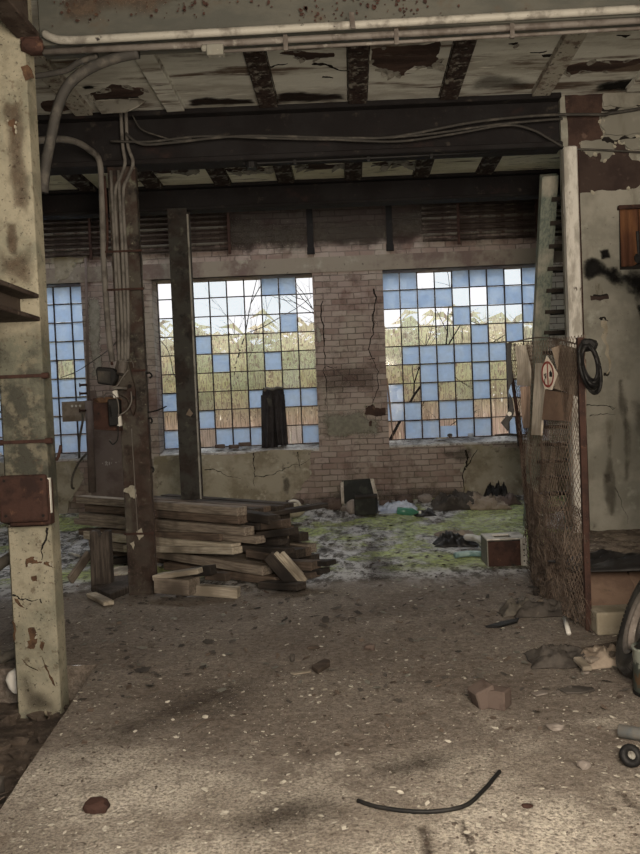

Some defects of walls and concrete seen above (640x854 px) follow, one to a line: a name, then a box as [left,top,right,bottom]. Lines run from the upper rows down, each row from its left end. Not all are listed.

corrosion [299,0,429,23]
flaking render [368,42,445,81]
flaking render [564,58,640,77]
flaking render [565,92,640,195]
crack [368,289,379,421]
crack [205,452,306,484]
crack [462,450,477,490]